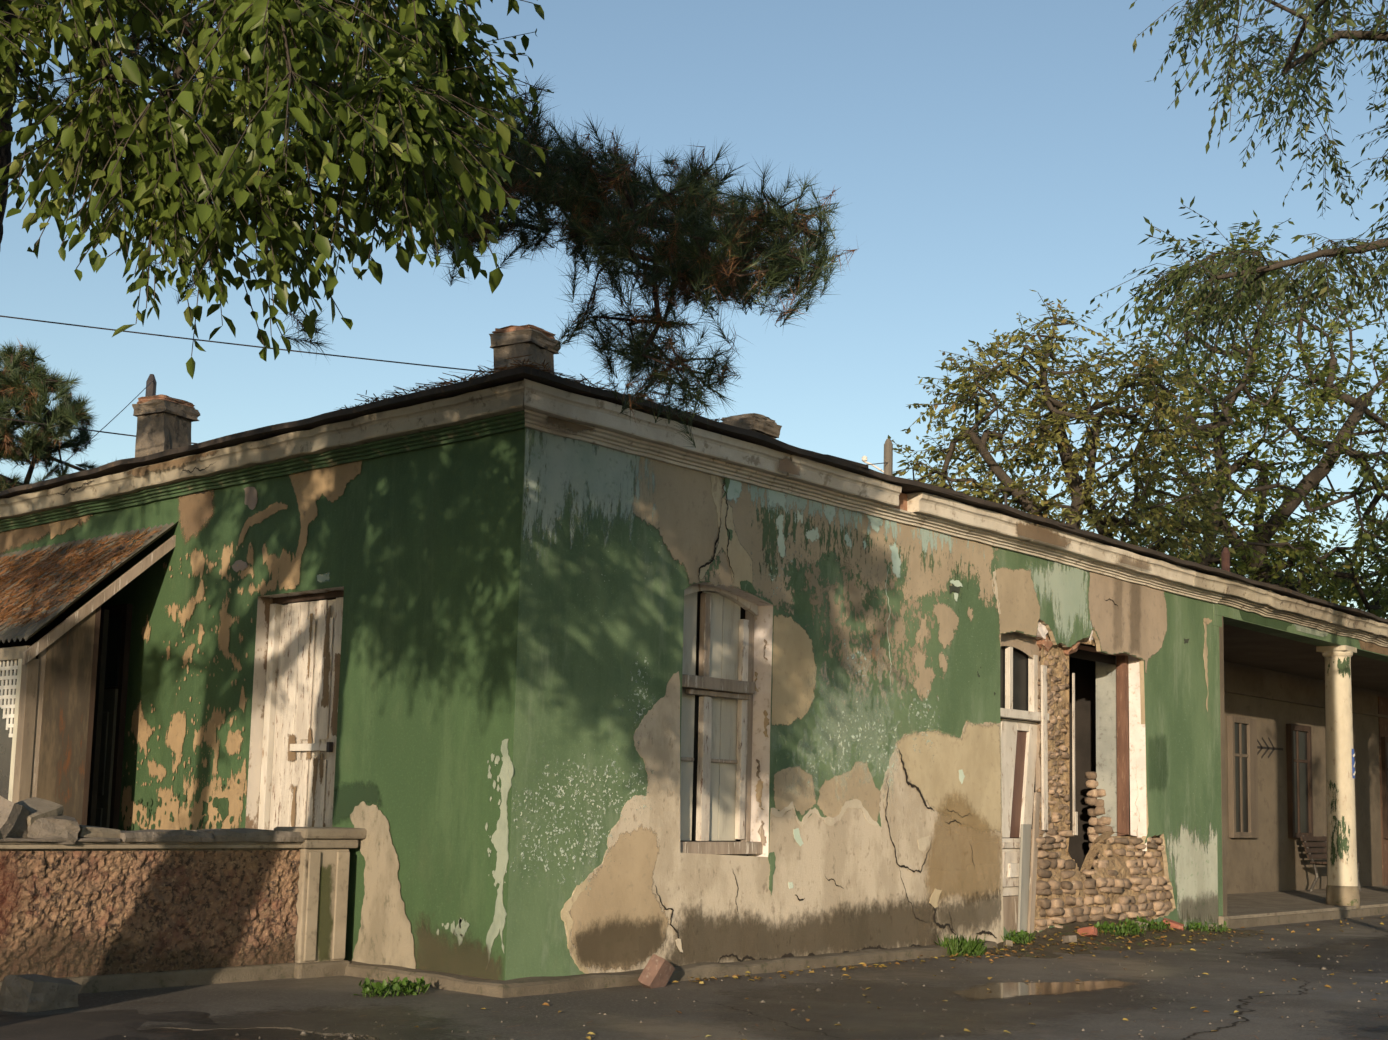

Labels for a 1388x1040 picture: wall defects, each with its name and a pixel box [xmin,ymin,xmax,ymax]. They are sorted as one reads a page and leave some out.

peeling [121,461,362,831]
peeling [436,917,469,946]
crack [656,887,683,954]
peeling [485,478,1004,974]
water stain [576,895,1001,968]
crack [718,749,997,963]
spalling [1030,618,1218,930]